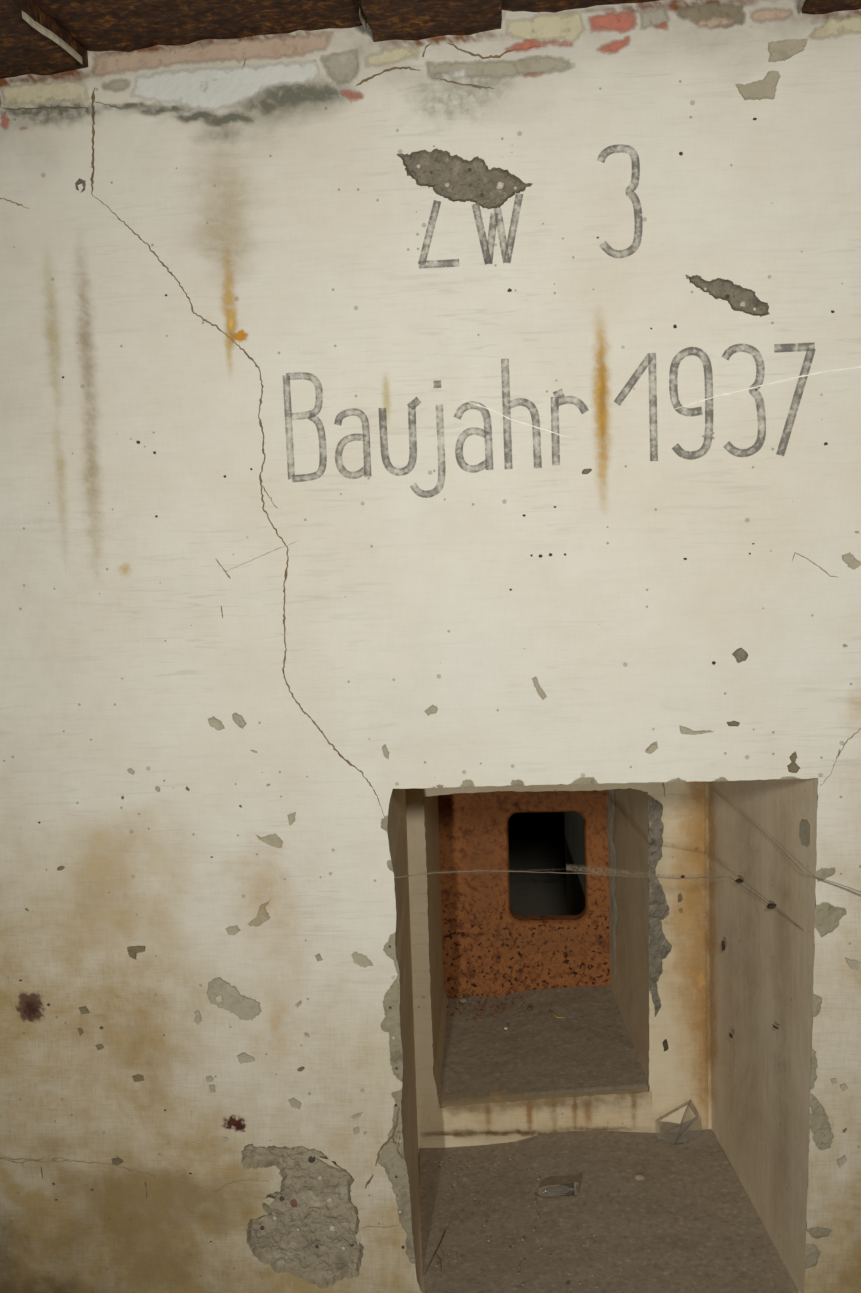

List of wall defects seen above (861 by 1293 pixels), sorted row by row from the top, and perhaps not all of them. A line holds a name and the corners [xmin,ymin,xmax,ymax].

flaking render [511,40,572,51]
flaking render [591,12,635,53]
flaking render [751,9,791,22]
peeling [735,38,808,100]
spalling [396,149,532,209]
rust [225,277,247,341]
spalling [685,274,770,317]
rust [595,337,607,477]
crack [0,87,385,817]
crack [820,728,861,786]
peeling [194,977,262,1025]
spalling [241,1144,364,1289]